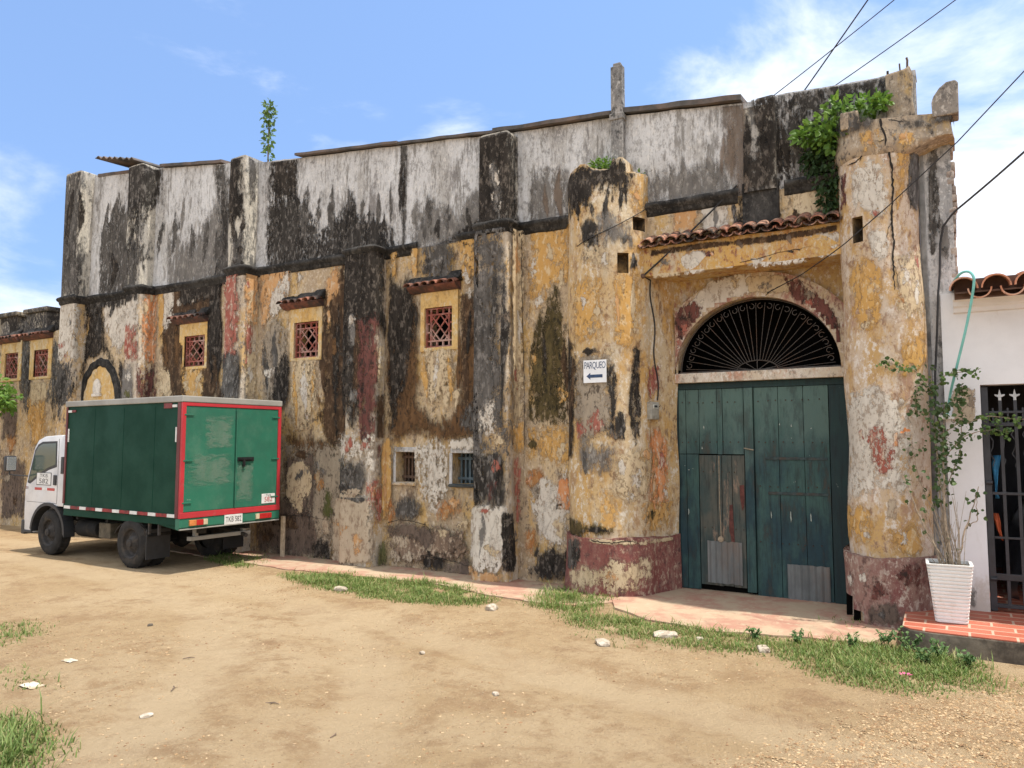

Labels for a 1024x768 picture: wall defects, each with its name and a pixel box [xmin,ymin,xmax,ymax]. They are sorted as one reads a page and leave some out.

peeling [652,191,839,317]
crack [847,119,903,290]
leakage [0,77,886,581]
peeling [528,443,570,550]
peeling [846,385,912,499]
peeling [569,537,673,593]